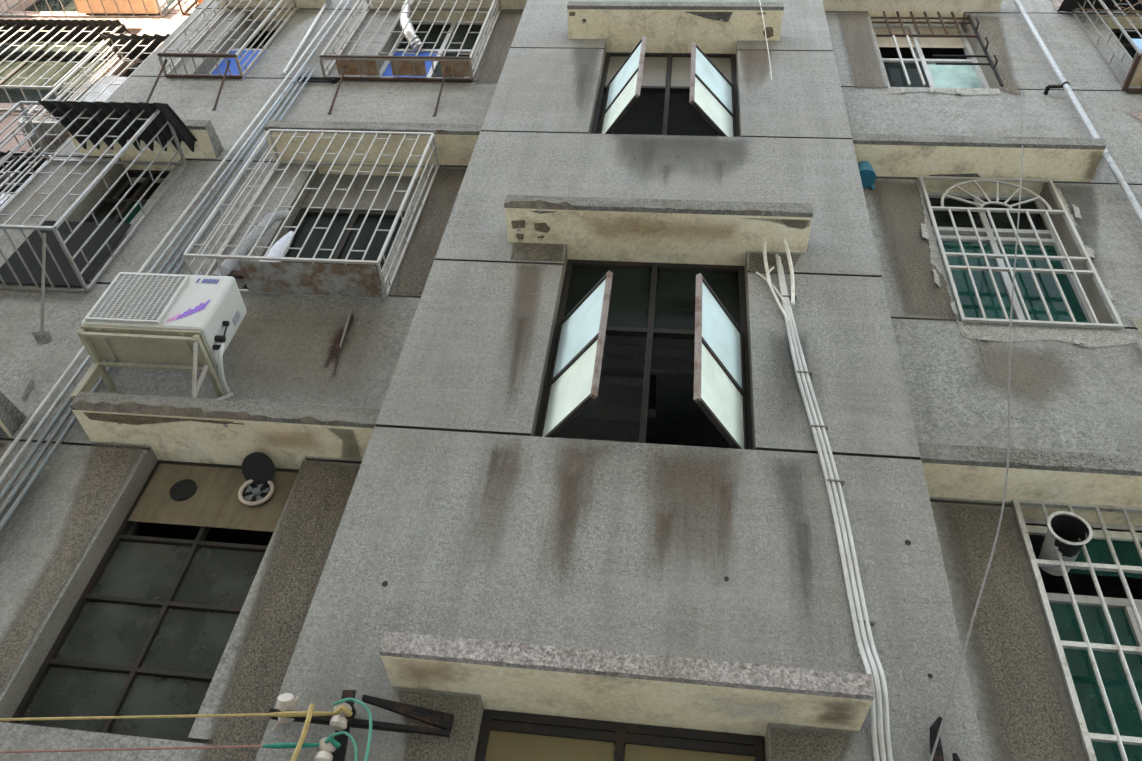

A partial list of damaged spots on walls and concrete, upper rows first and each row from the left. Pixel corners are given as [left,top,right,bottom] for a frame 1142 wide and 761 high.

peeling [511,210,557,242]
rust [325,315,354,376]
spalling [83,412,244,428]